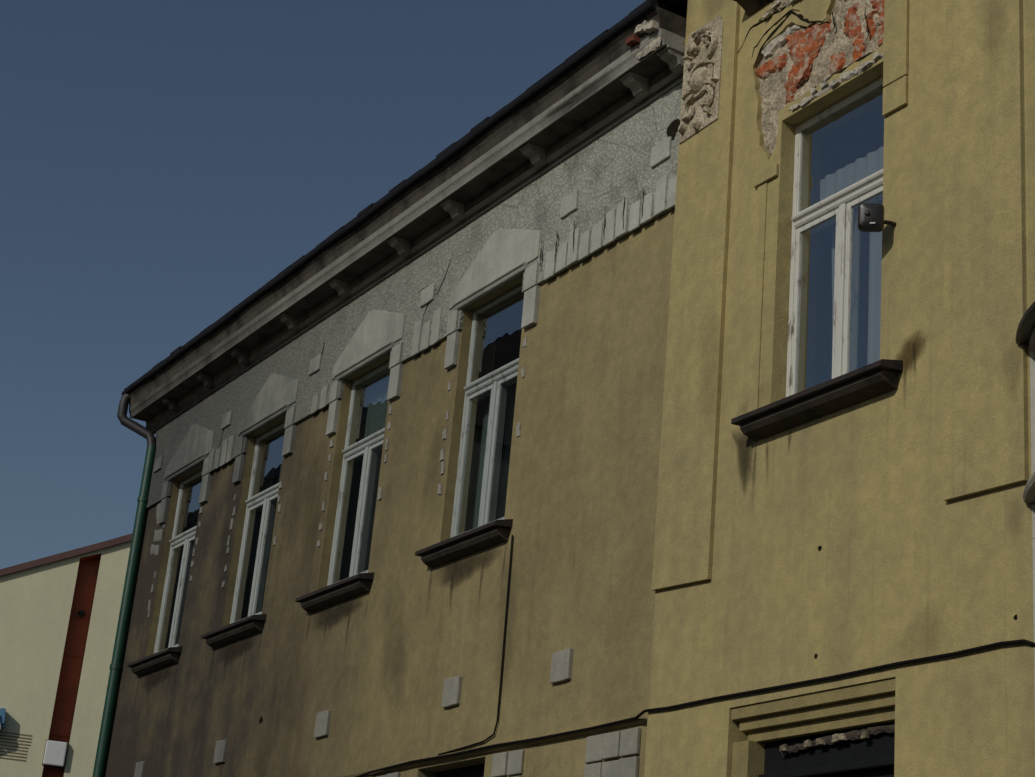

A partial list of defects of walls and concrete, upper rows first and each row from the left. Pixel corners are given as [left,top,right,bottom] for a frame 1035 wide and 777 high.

crack [738,1,800,55]
flaking render [755,0,884,155]
flaking render [780,724,895,757]